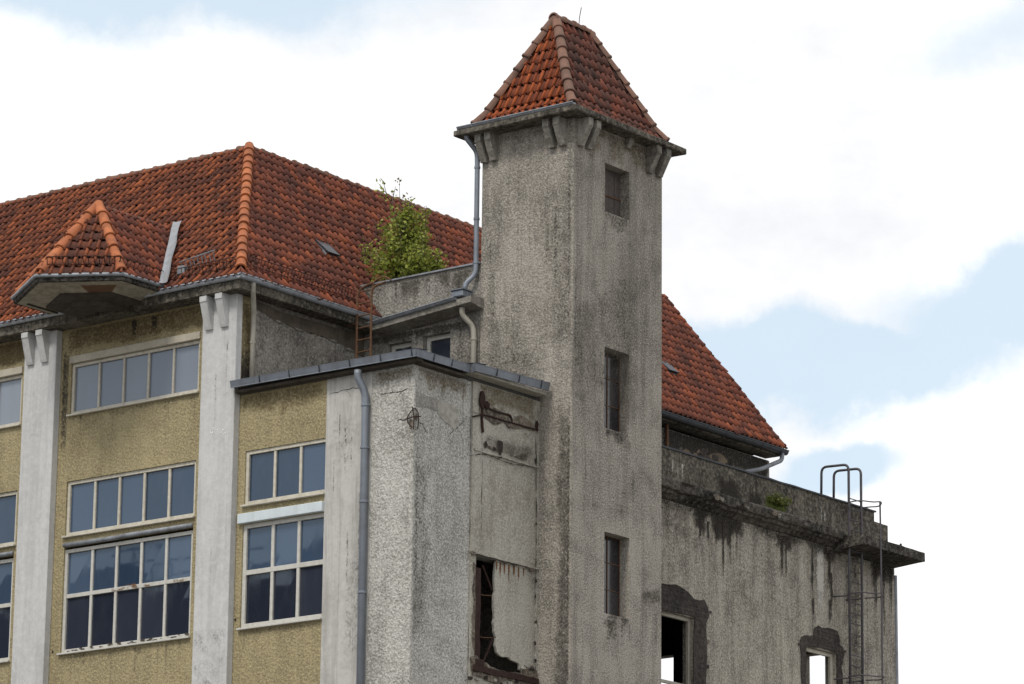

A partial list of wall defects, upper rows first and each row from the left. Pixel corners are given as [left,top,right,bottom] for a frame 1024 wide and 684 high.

water stain [661,498,744,573]
spalling [468,551,538,684]
corrosion [471,565,539,684]
water stain [757,526,861,684]
water stain [871,562,894,630]